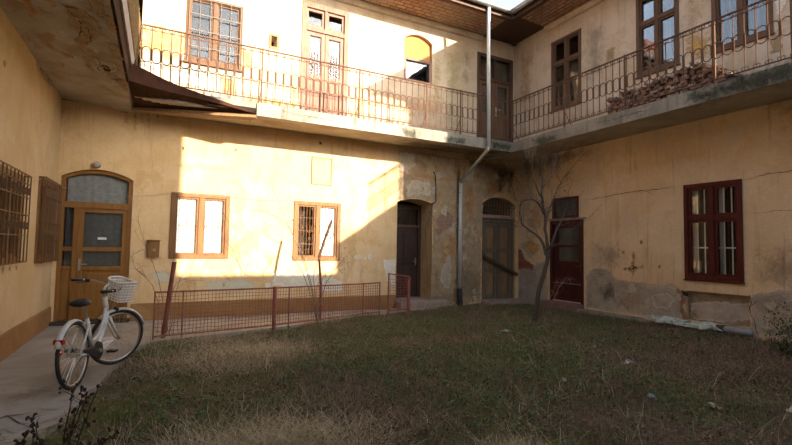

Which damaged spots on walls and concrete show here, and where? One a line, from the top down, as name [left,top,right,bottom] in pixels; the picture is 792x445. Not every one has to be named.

peeling [773,0,789,17]
flaking render [22,0,130,93]
water stain [688,59,792,106]
flaking render [397,150,514,305]
peeling [204,267,344,293]
peeling [383,259,396,286]
flaking render [518,240,548,305]
flaking render [586,267,792,339]